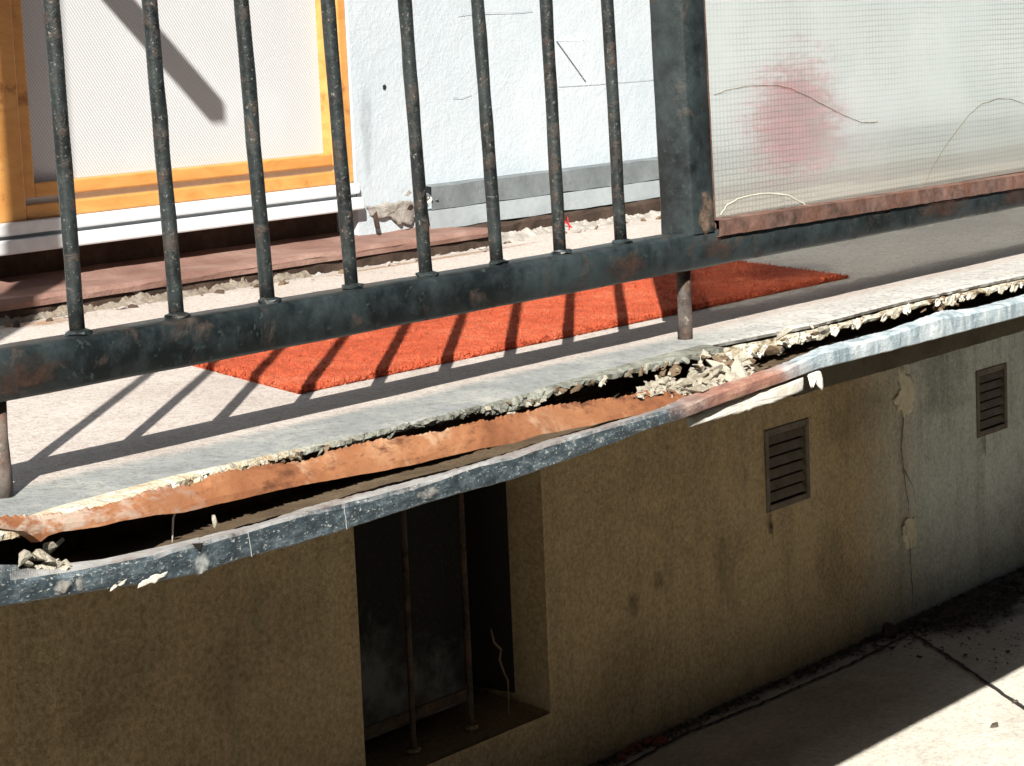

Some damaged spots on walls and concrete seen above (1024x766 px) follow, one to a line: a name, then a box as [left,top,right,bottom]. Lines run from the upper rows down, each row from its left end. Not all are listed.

peeling [881,281,1023,323]
spalling [450,318,862,427]
spalling [317,427,394,457]
spalling [174,453,304,488]
crack [899,417,916,593]
peeling [196,555,209,574]